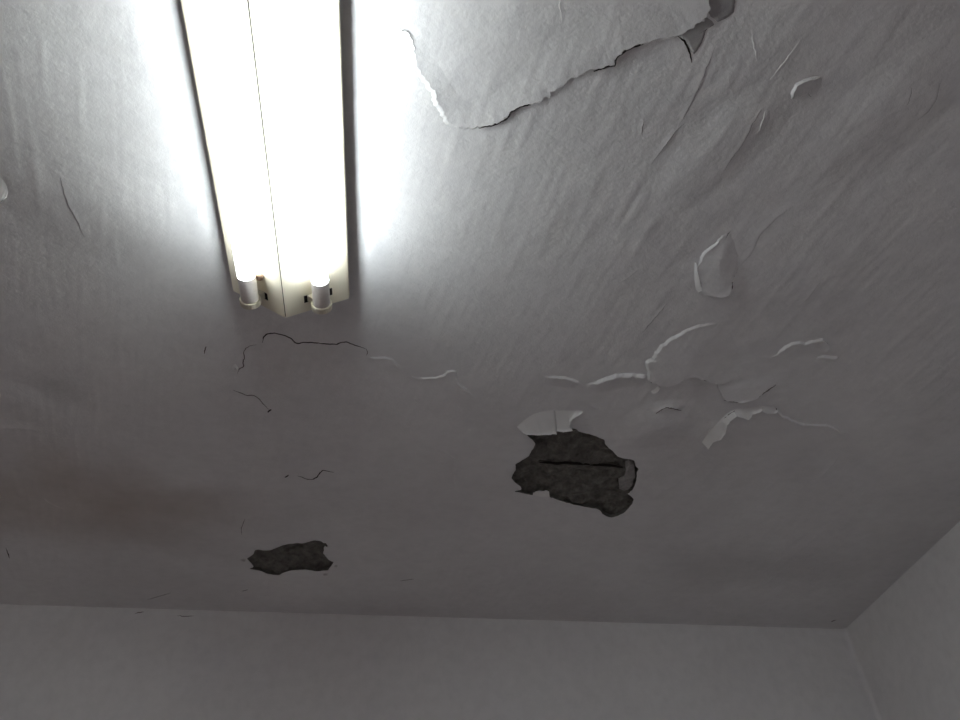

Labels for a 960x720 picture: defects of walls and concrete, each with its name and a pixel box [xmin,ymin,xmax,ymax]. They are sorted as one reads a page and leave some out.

peeling [386,0,735,130]
peeling [791,76,823,100]
crack [234,333,368,412]
peeling [543,373,688,414]
spalling [505,410,645,521]
spalling [242,537,339,578]